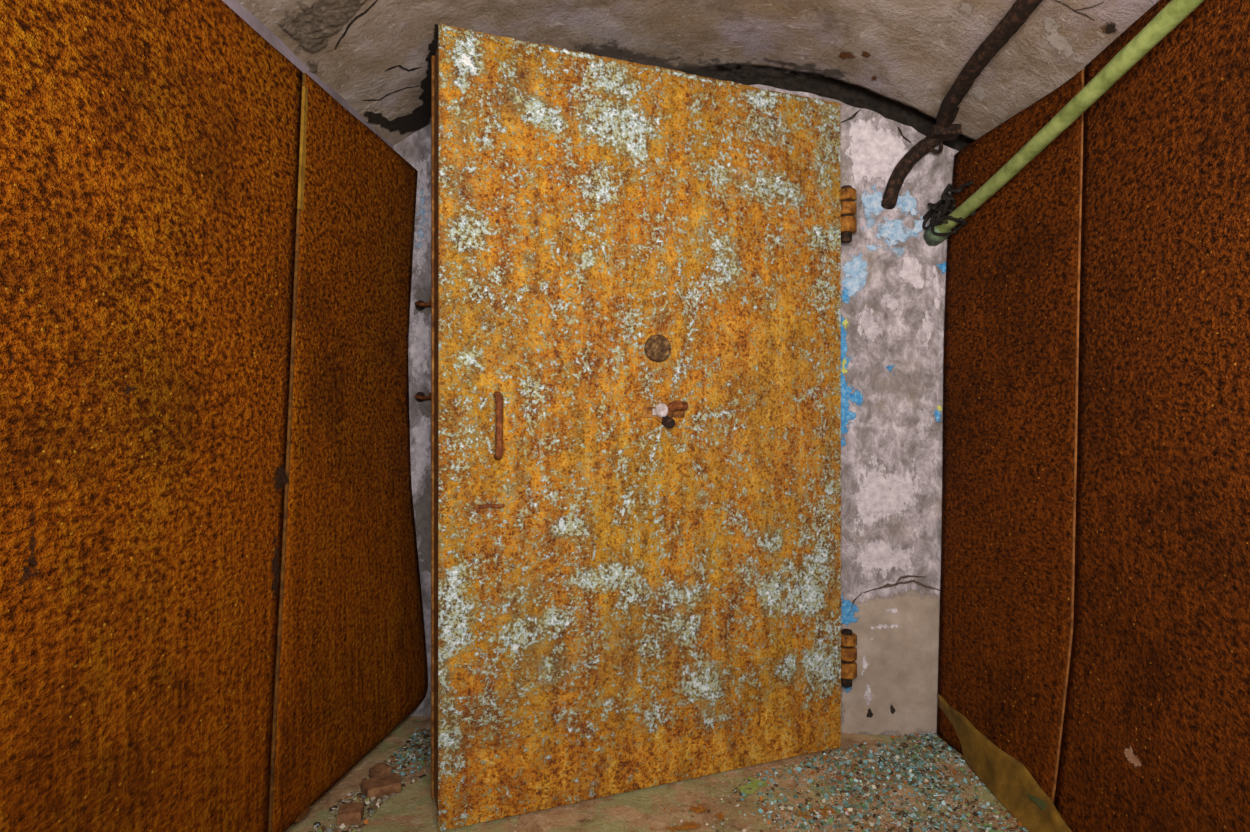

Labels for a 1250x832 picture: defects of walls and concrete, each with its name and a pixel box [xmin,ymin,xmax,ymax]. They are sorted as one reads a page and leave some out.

crack [334,0,378,50]
crack [362,24,438,134]
peeling [841,117,946,449]
peeling [850,451,926,579]
corrosion [666,805,724,831]
corrosion [794,805,837,818]